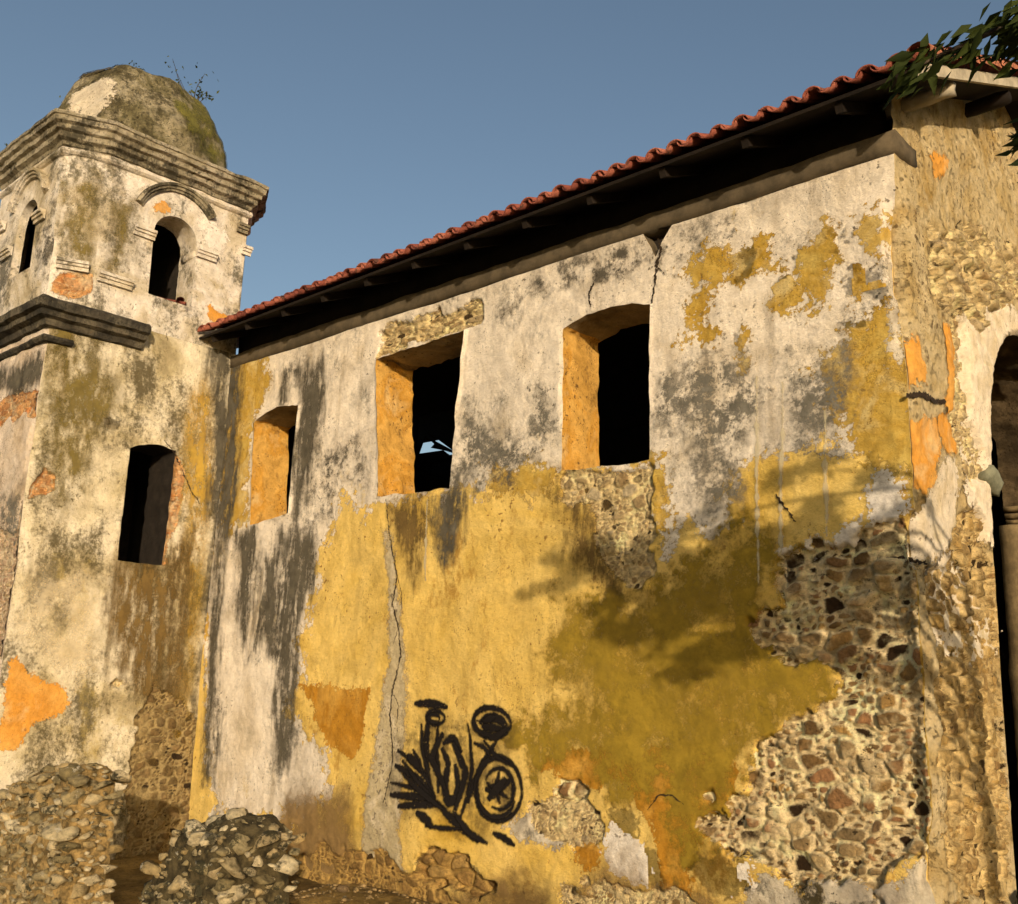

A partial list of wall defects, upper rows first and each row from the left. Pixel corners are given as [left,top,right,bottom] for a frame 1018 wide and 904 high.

crack [651,238,664,303]
water stain [0,346,118,506]
mould [789,339,856,449]
water stain [1,494,22,553]
peeling [0,468,72,752]
water stain [105,529,196,702]
water stain [195,347,366,788]
crack [383,500,402,802]
peeling [115,150,1018,904]
water stain [501,351,845,869]
water stain [580,868,637,900]
water stain [647,887,713,904]